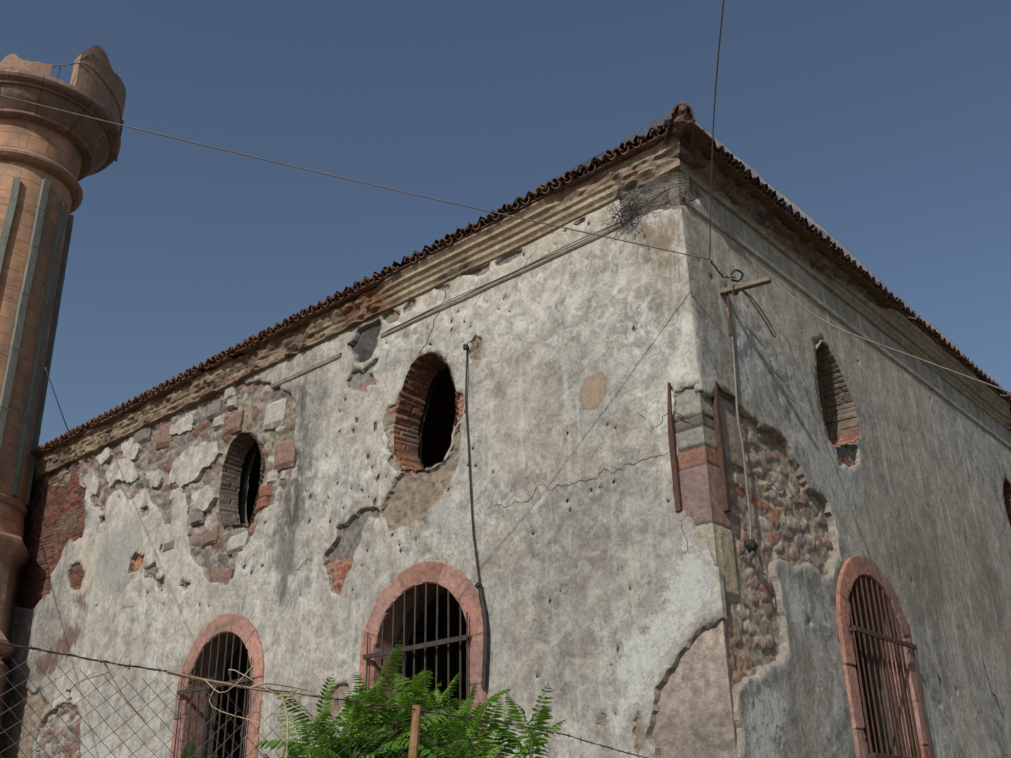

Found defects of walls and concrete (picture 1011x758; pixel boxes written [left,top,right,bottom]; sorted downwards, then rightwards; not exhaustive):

spalling [339,298,416,413]
spalling [16,380,299,610]
spalling [324,392,477,595]
crack [489,452,668,508]
spalling [632,386,838,758]
spalling [0,685,81,758]